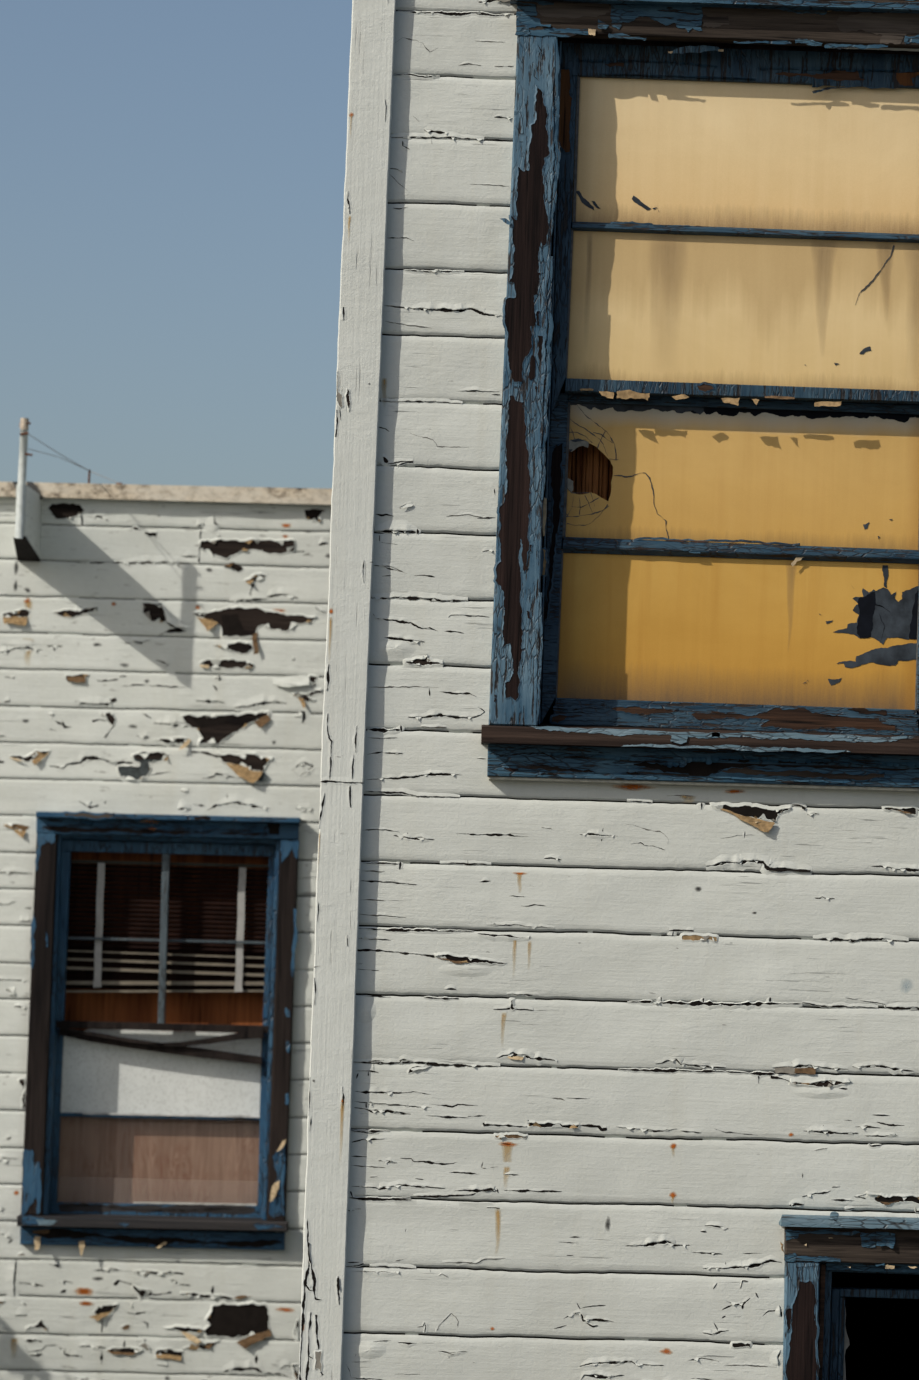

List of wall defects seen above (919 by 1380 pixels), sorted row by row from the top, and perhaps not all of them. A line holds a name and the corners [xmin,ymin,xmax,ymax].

peeling [515,0,919,54]
peeling [493,67,585,702]
peeling [141,530,317,671]
peeling [115,709,275,783]
peeling [709,802,792,832]
crack [616,1054,914,1151]
crack [62,1204,252,1212]
crack [201,1048,562,1380]
crack [789,1185,866,1223]
crack [127,1303,148,1329]
peeling [90,1269,272,1363]
crack [157,1360,169,1369]